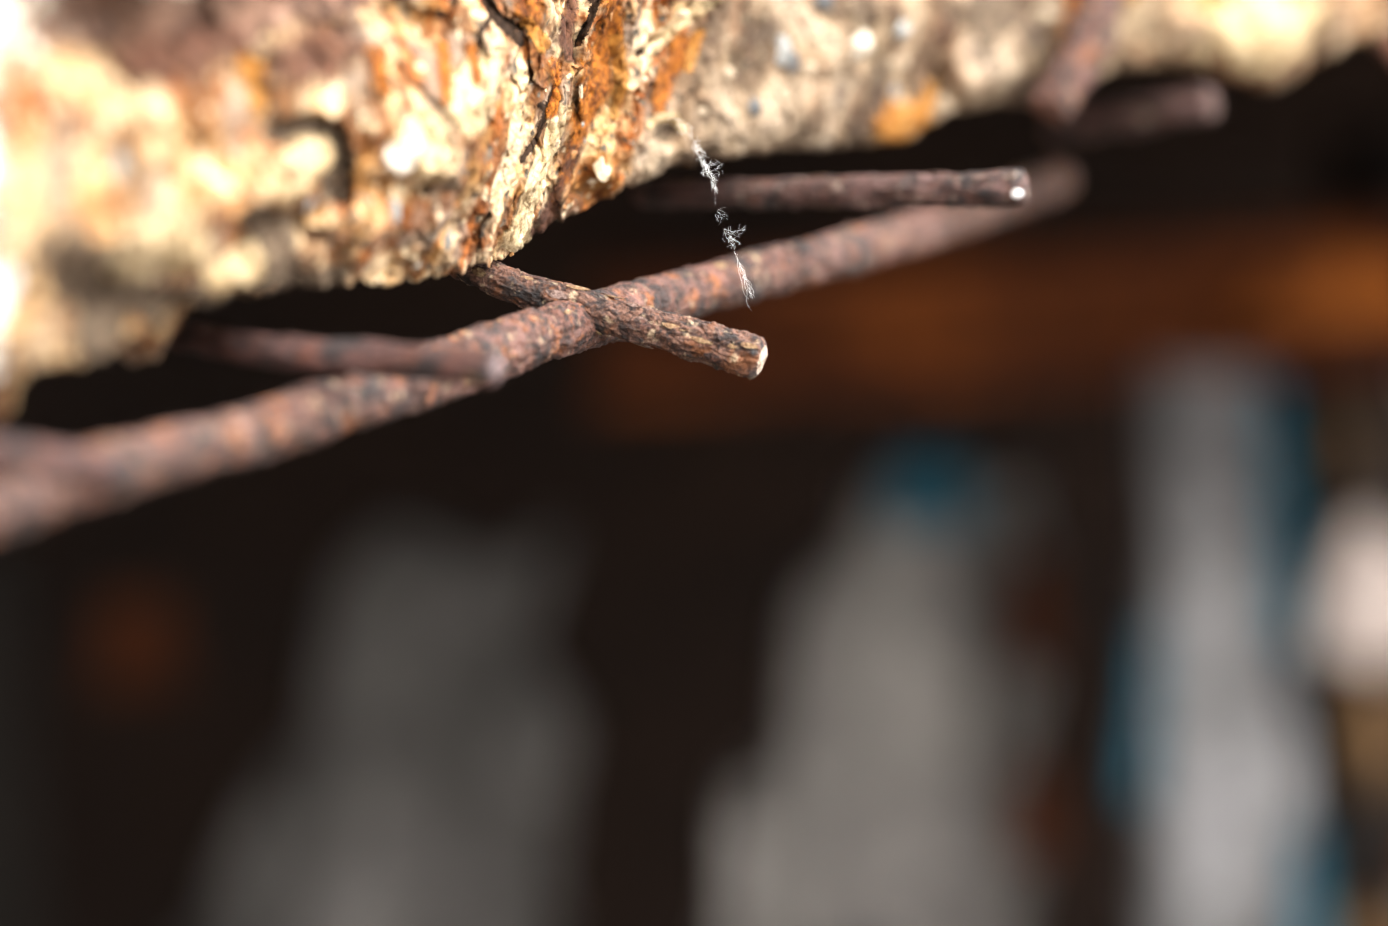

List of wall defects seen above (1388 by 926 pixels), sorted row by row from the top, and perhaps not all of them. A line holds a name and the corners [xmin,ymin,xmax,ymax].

rust [94,15,391,117]
spalling [384,43,505,183]
rust [437,40,483,108]
crack [475,0,531,55]
crack [520,81,555,164]
rust [515,0,629,206]
crack [574,0,604,47]
rust [651,29,705,115]
spalling [644,0,721,56]
peeling [260,135,335,199]
spalling [501,84,611,257]
rust [520,274,758,363]